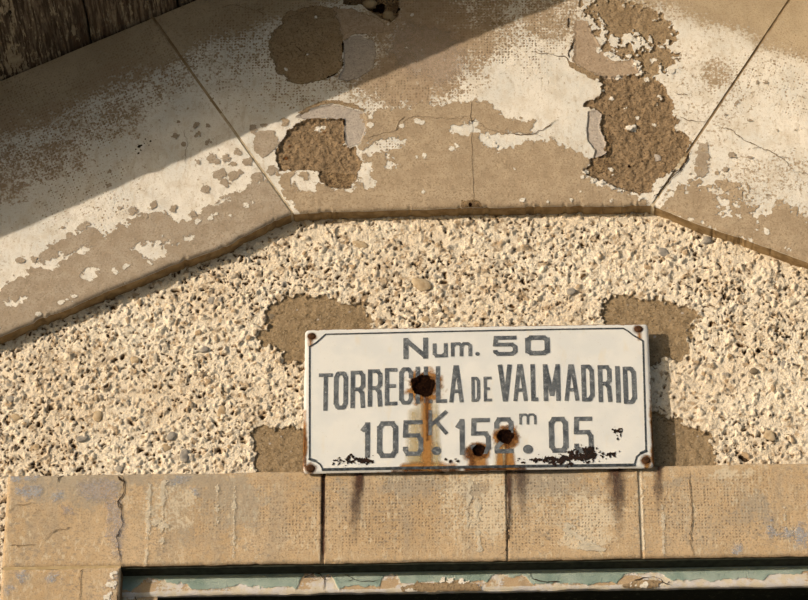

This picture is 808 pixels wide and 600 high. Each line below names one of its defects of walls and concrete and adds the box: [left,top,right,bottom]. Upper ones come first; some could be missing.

peeling [0,0,808,337]
crack [681,117,807,174]
spalling [256,292,373,365]
spalling [600,294,700,366]
spalling [250,425,303,472]
corrosion [393,371,526,472]
spalling [652,411,718,467]
crack [116,476,125,563]
peeling [401,577,481,592]
peeling [622,580,662,589]